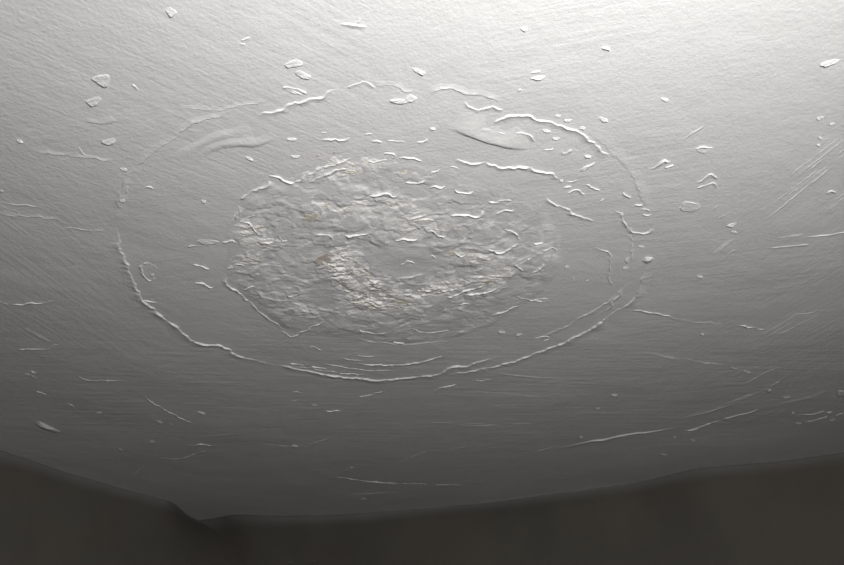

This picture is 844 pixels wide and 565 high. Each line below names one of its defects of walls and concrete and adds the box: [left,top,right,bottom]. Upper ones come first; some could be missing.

peeling [284,59,311,79]
peeling [560,155,604,202]
peeling [188,129,575,345]